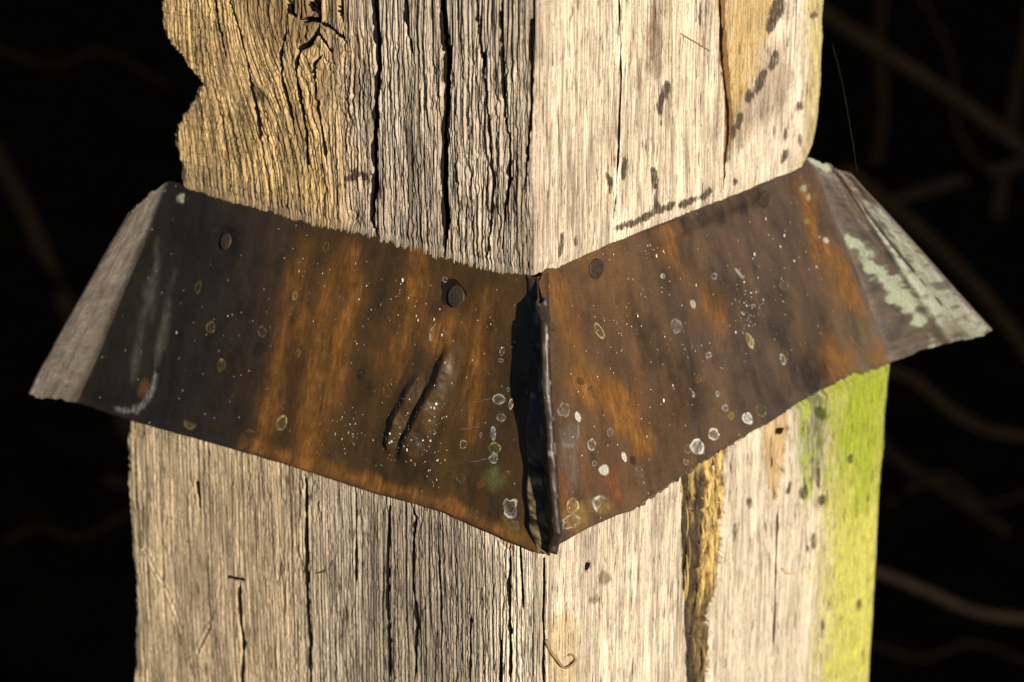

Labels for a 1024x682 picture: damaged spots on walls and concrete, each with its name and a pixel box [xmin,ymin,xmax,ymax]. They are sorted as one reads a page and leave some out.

crack [279,1,347,173]
crack [370,0,413,234]
crack [440,0,453,252]
crack [719,0,729,189]
corrosion [278,249,360,469]
crack [305,475,313,682]
crack [386,502,443,682]
damp [786,468,825,505]